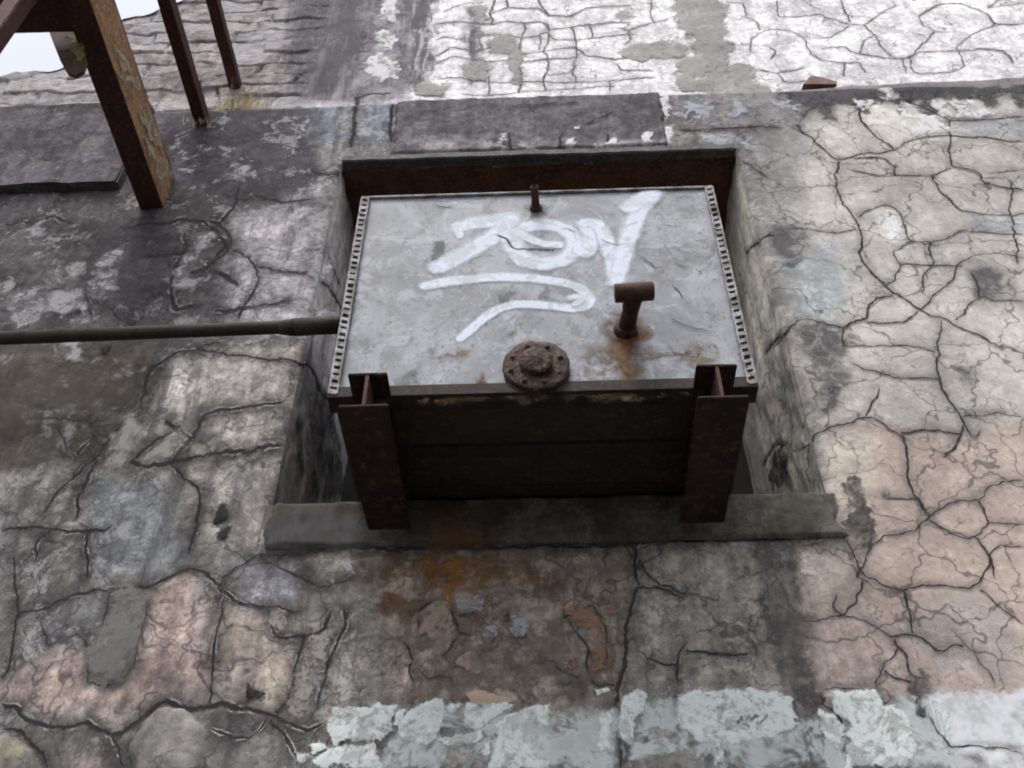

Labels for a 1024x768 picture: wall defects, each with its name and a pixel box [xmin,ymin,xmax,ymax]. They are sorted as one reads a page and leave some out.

crack [436,0,668,142]
crack [731,0,1024,102]
crack [682,124,781,132]
crack [125,167,341,319]
corrosion [587,314,662,380]
crack [745,97,1023,753]
flaking render [268,609,288,632]
crack [1,340,801,767]
corrosion [378,555,440,624]
flaking render [752,543,801,645]
flaking render [284,633,336,719]
flaking render [297,586,1024,768]